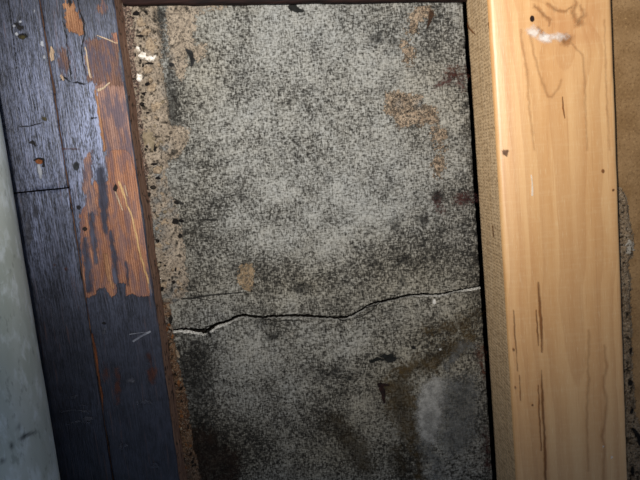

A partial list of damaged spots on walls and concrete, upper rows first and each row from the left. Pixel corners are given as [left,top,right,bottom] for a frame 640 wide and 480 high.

peeling [79,37,150,298]
crack [172,285,481,337]
water stain [369,354,396,363]
water stain [377,336,474,479]